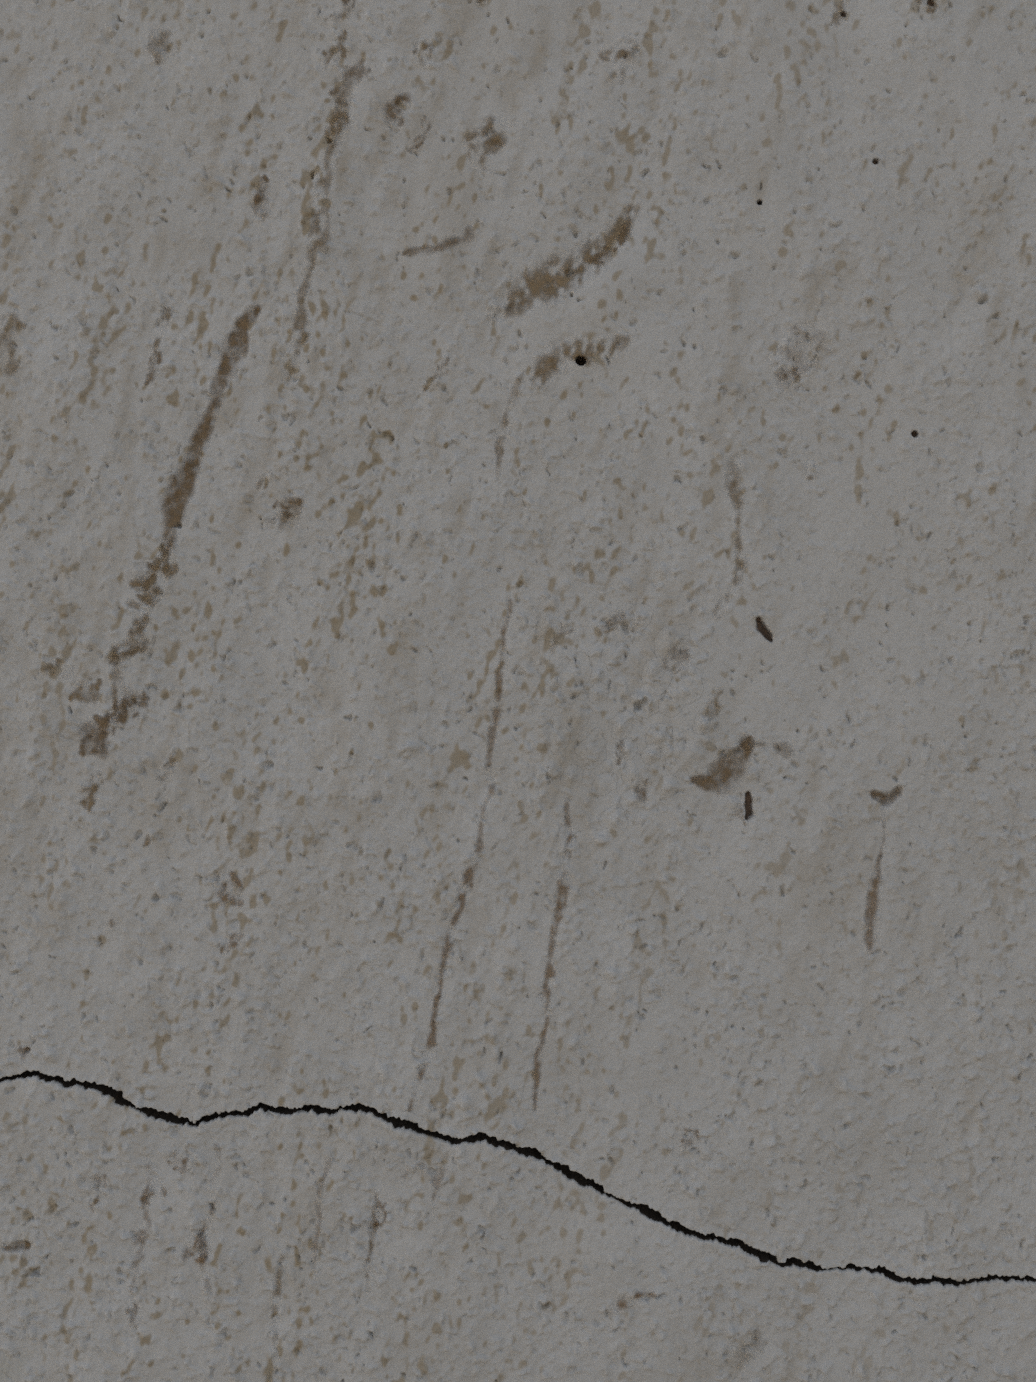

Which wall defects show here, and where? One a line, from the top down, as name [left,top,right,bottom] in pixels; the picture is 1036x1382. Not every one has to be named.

crack [0,1062,1036,1296]